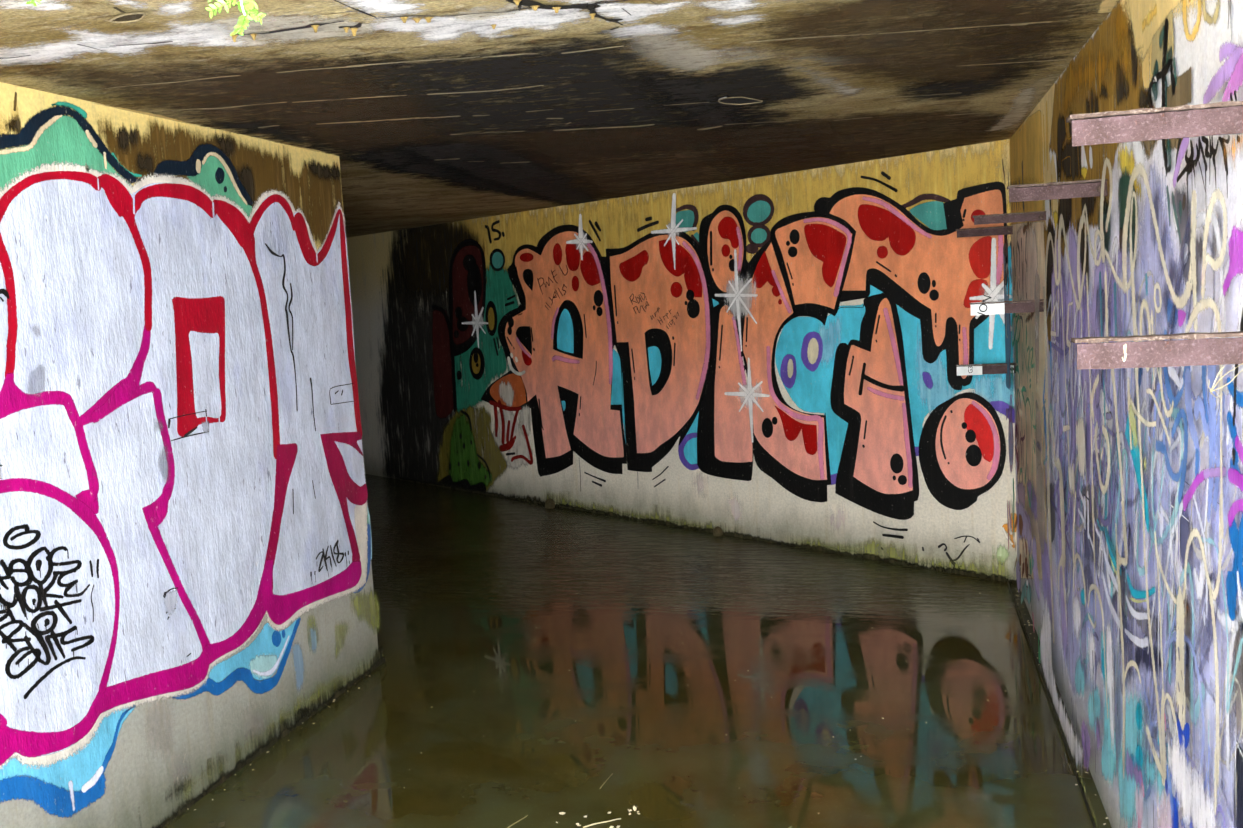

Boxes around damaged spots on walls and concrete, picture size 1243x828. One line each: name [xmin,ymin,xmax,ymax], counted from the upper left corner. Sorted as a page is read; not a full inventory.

crack [230,0,655,42]
water stain [701,0,762,25]
crack [77,41,173,51]
water stain [0,0,723,70]
water stain [5,116,21,133]